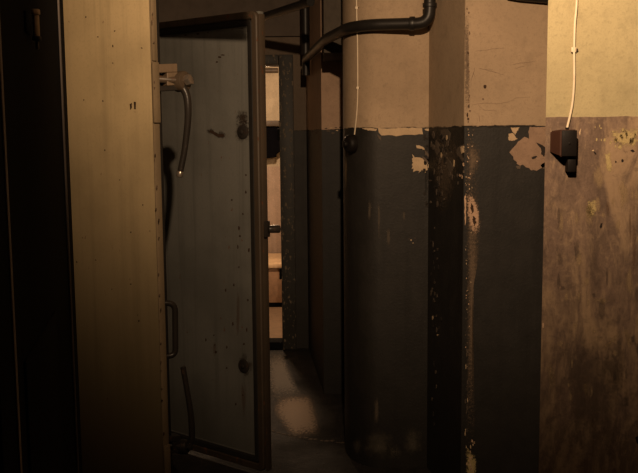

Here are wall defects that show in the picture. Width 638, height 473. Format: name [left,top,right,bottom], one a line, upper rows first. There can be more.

peeling [508,127,546,171]
peeling [596,128,638,152]
peeling [362,127,480,418]
spalling [466,440,476,473]